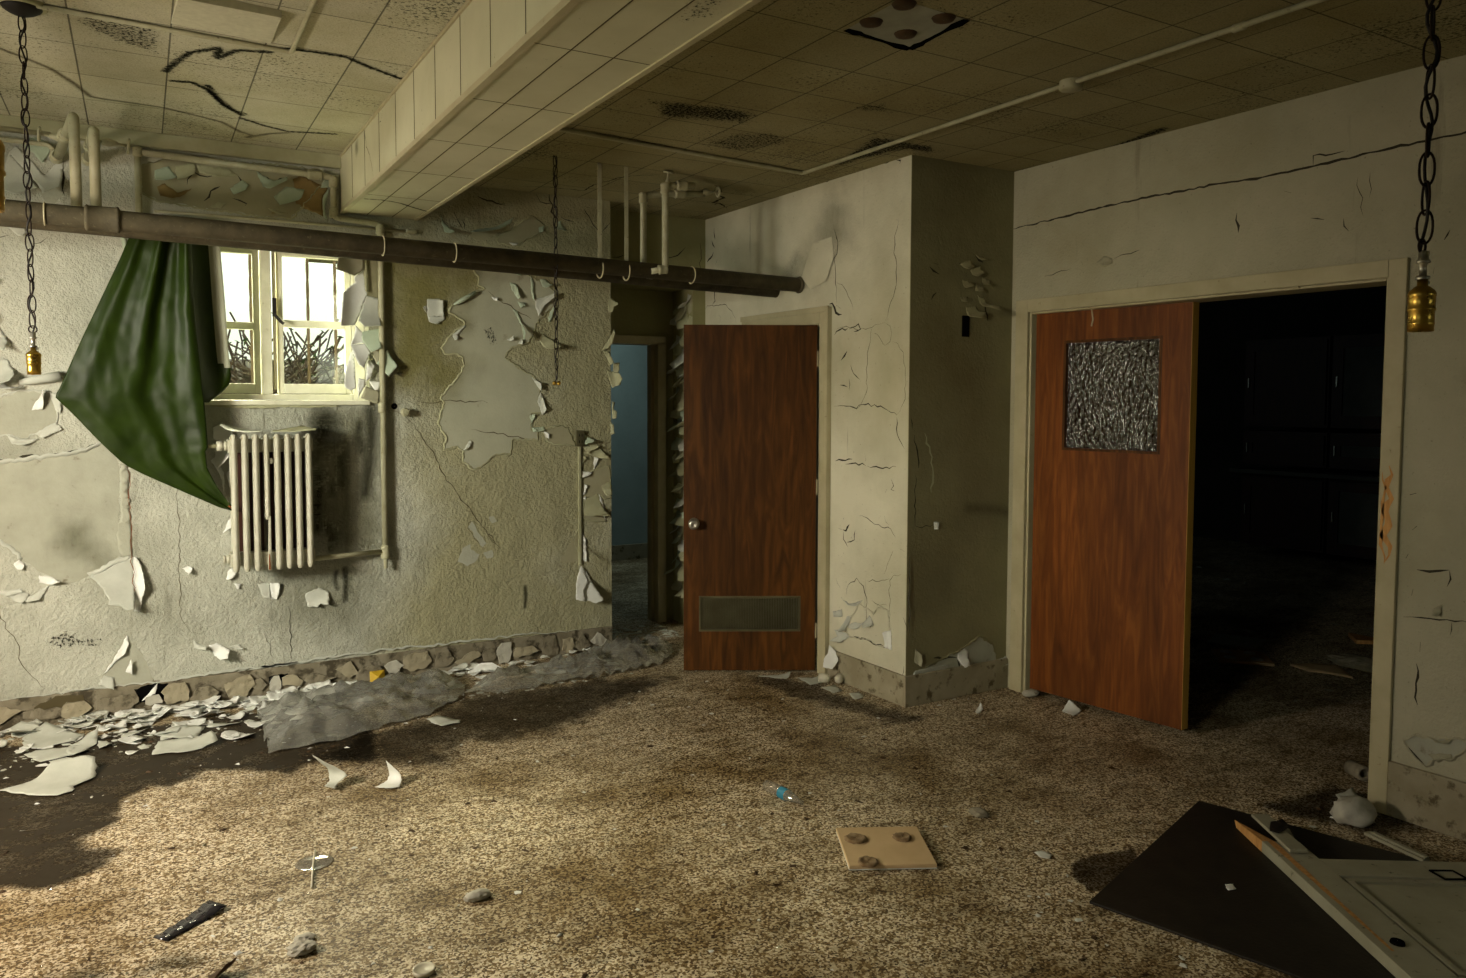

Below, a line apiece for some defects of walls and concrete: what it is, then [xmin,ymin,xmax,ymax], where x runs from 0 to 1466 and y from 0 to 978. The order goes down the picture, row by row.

peeling [4,137,63,204]
peeling [141,155,329,220]
crack [1015,131,1466,232]
peeling [335,257,397,409]
crack [0,441,102,464]
peeling [0,315,145,613]
peeling [210,405,339,492]
peeling [415,270,623,603]
crack [830,220,934,633]
peeling [0,631,564,767]
peeling [313,755,347,788]
peeling [376,761,402,788]